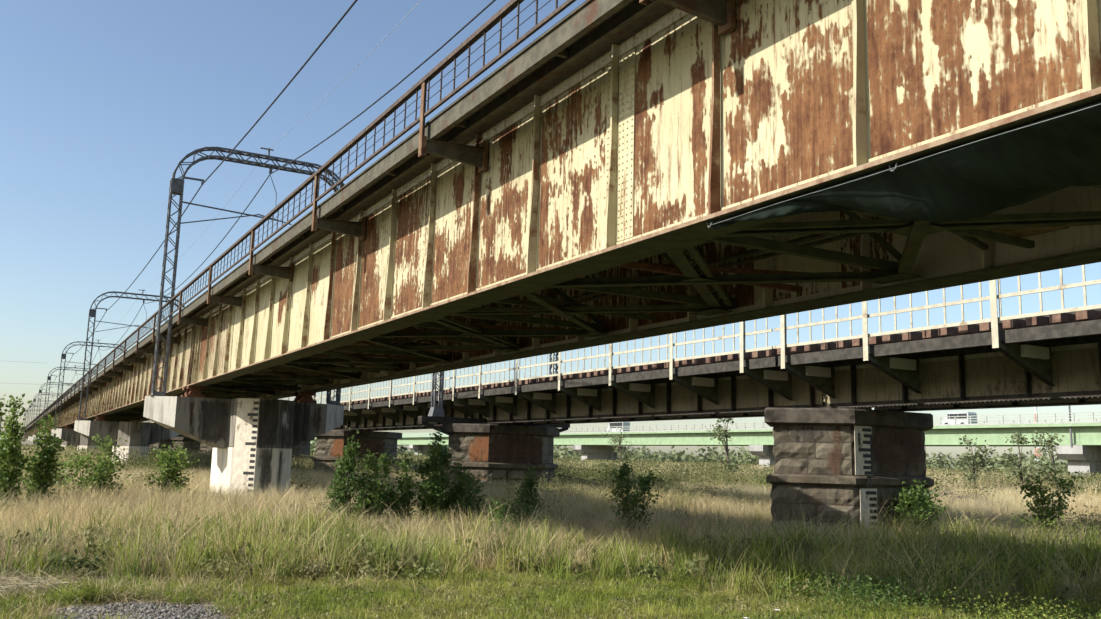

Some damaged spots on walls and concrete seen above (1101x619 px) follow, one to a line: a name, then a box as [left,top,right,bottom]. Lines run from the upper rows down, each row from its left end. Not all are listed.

corrosion [625,0,853,240]
corrosion [867,0,1083,158]
corrosion [311,67,607,336]
corrosion [277,286,292,326]
corrosion [568,254,701,339]
corrosion [682,242,754,310]
leakage [198,399,228,442]
leakage [258,398,310,497]